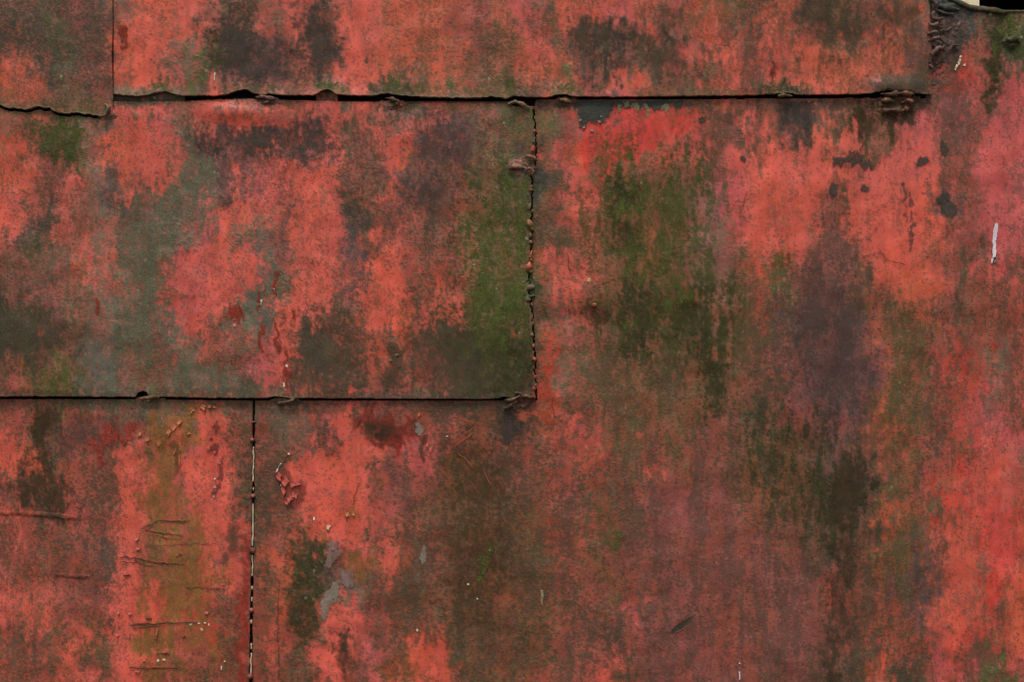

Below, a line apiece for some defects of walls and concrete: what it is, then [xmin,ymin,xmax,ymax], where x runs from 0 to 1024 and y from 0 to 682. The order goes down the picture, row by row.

rust [118,25,128,49]
peeling [832,150,875,170]
rust [258,322,291,389]
leakage [406,306,490,398]
rust [353,406,416,455]
peeling [137,402,223,539]
peeling [276,453,306,507]
peeling [320,525,371,626]